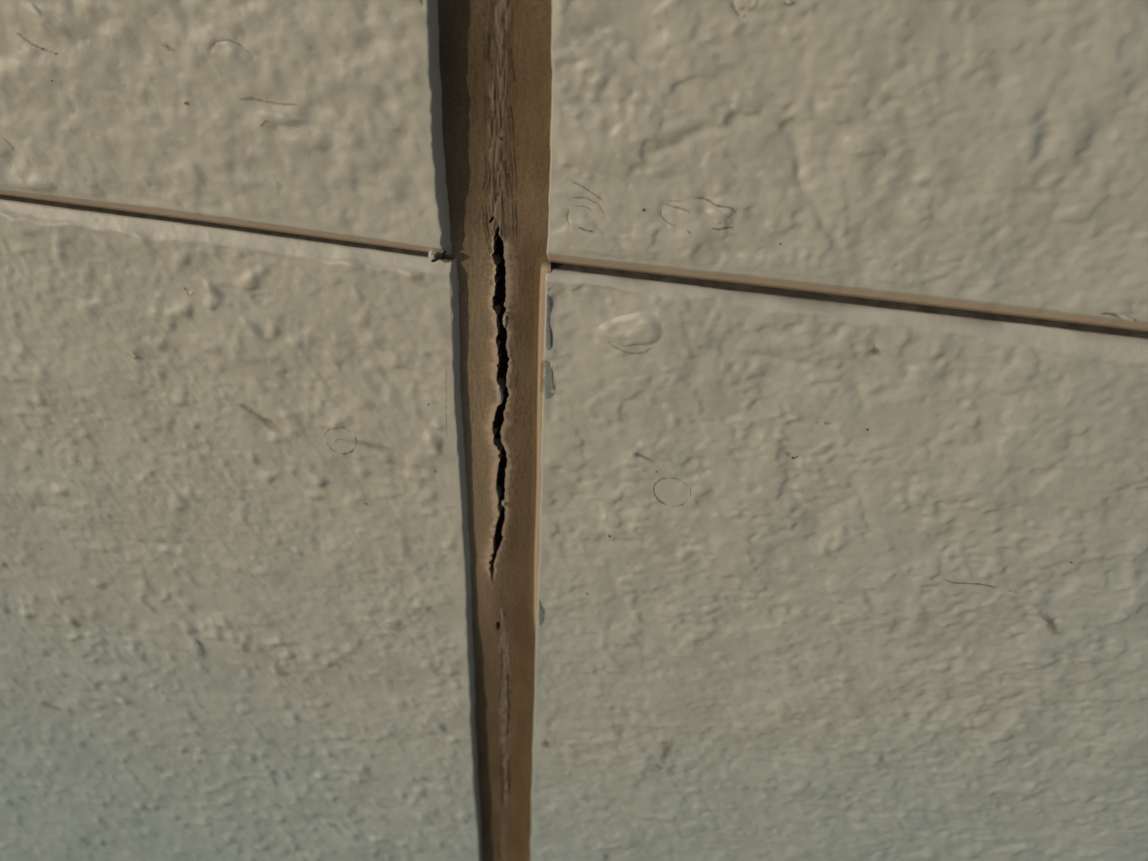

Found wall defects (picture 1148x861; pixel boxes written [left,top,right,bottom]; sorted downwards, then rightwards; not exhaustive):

crack [482,217,514,584]